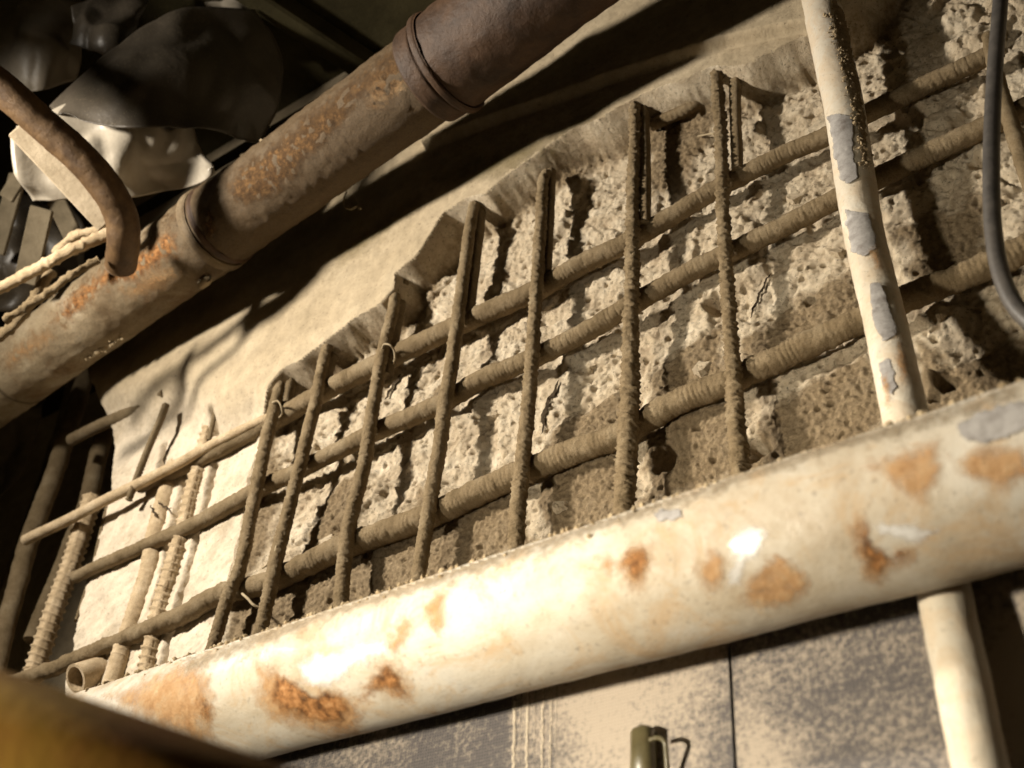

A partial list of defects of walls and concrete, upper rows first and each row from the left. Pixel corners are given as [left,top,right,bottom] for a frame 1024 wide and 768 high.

rust [232,53,401,205]
spalling [837,0,1024,412]
rust [58,236,175,317]
crack [750,274,771,318]
spalling [0,35,897,686]
peeling [957,401,1024,443]
rust [884,448,938,494]
rust [962,450,1024,485]
rust [605,551,648,582]
rust [748,556,805,606]
rust [856,526,907,580]
peeling [879,525,931,541]